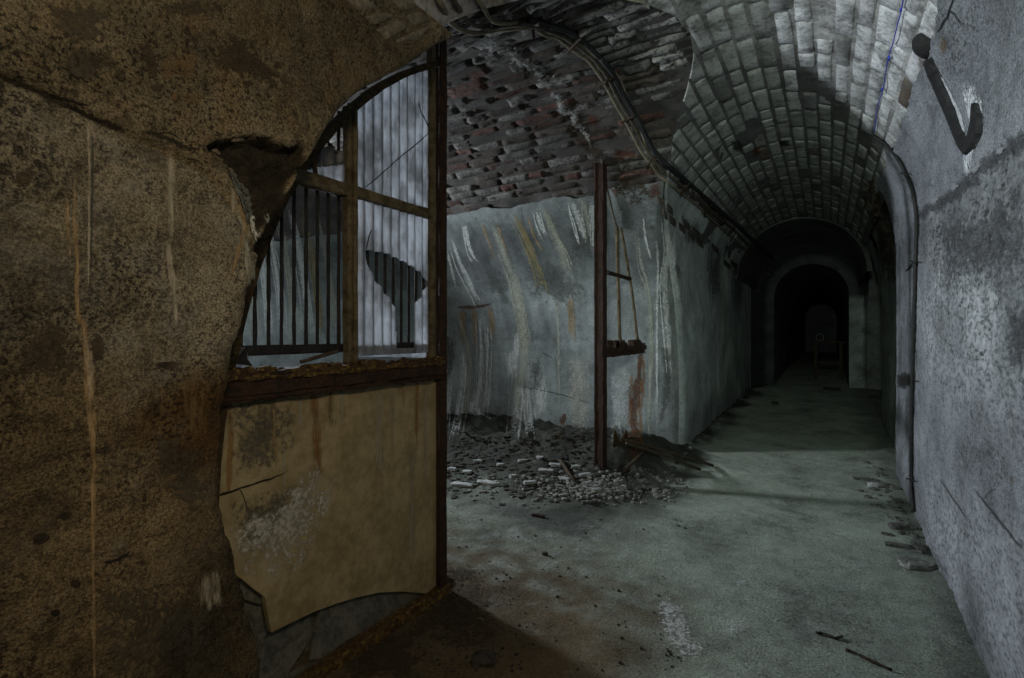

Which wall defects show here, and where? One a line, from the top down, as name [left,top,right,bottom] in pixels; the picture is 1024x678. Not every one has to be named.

crack [938,0,961,31]
crack [0,74,197,150]
leakage [479,37,595,147]
spalling [207,132,305,234]
leakage [447,226,480,305]
leakage [512,213,583,341]
leakage [568,203,594,257]
leakage [447,320,492,433]
leakage [511,360,547,438]
corrosion [628,354,644,457]
crack [220,470,288,510]
leakage [233,471,332,578]